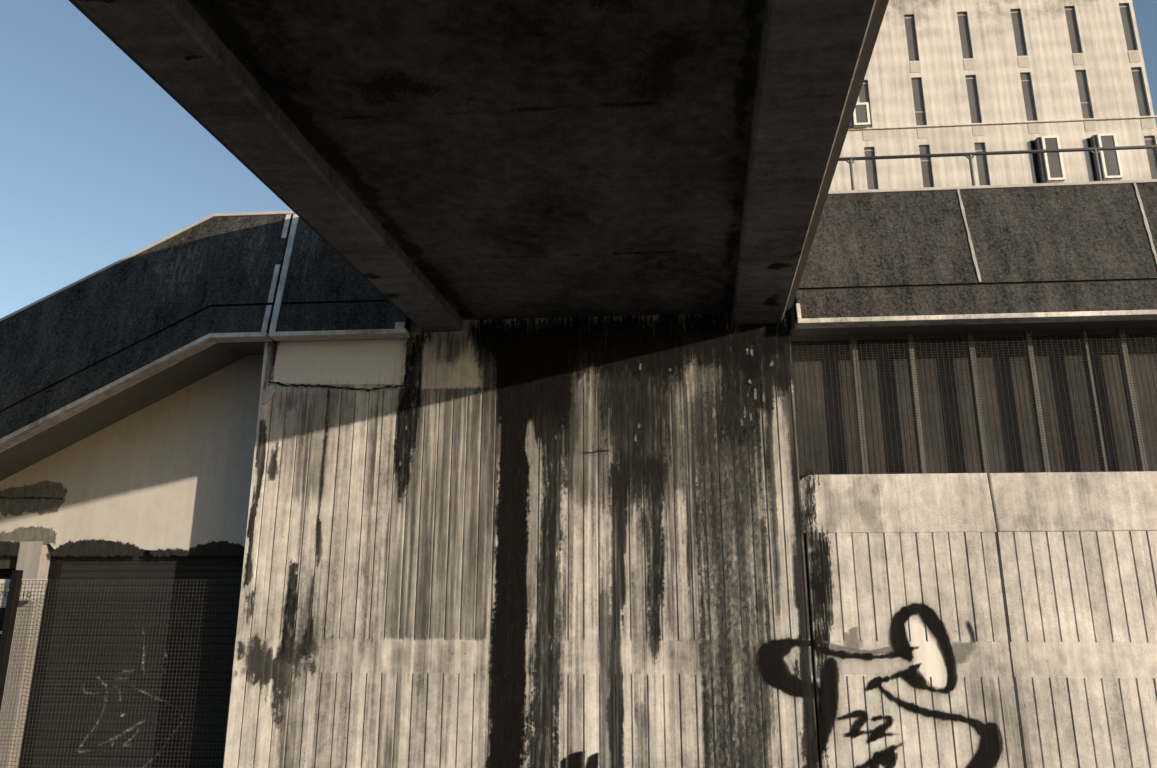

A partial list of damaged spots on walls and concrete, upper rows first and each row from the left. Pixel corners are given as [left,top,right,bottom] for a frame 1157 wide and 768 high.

damp [263,340,280,389]
flaking render [0,480,245,558]
damp [244,420,268,588]
damp [278,389,330,659]
damp [368,333,502,661]
damp [525,323,834,768]
damp [379,689,400,768]